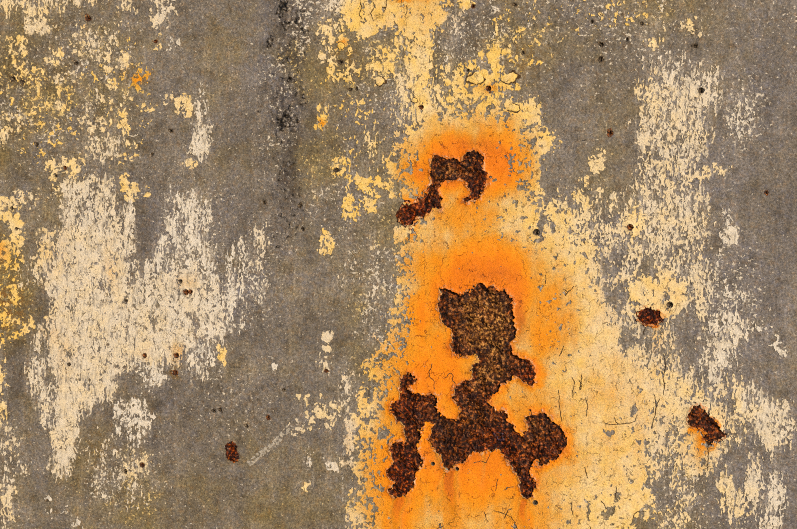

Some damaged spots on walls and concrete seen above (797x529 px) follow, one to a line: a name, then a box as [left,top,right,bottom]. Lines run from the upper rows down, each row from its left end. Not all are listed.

peeling [0,0,270,529]
rust [225,441,240,463]
peeling [288,212,452,529]
rust [362,118,578,529]
peeling [314,0,797,529]
rust [635,305,664,328]
rust [686,402,727,457]